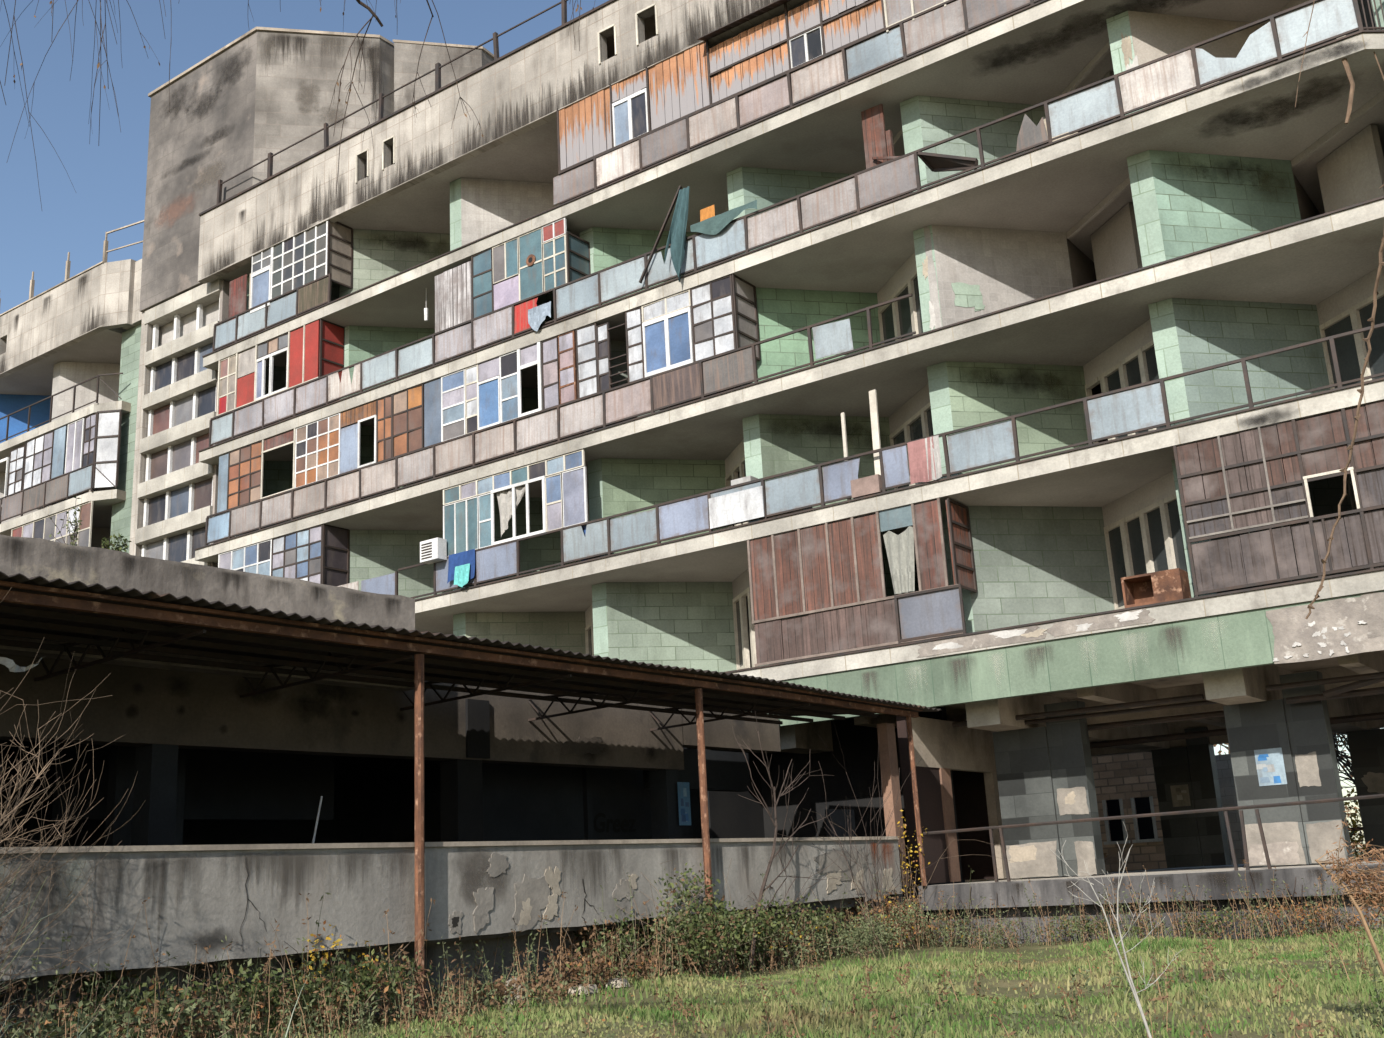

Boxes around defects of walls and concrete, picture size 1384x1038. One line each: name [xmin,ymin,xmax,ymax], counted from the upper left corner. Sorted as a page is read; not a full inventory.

damp [267,35,306,56]
damp [636,0,777,72]
damp [992,14,1103,67]
damp [462,66,619,155]
damp [1220,79,1344,125]
damp [252,151,443,254]
spalling [1266,592,1384,664]
flaking render [448,853,561,934]
damp [290,938,320,982]